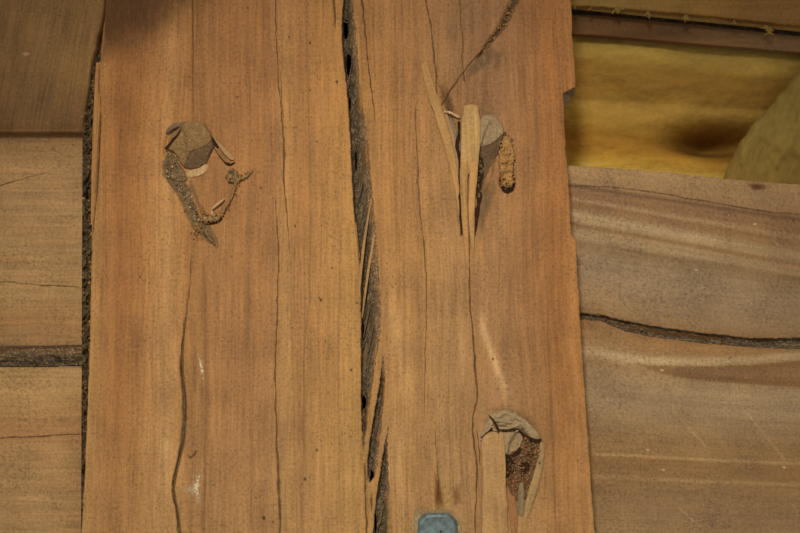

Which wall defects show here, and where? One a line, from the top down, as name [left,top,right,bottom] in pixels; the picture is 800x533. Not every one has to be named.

crack [172,262,196,533]
peeling [212,135,235,166]
crack [274,2,290,533]
crack [333,0,390,533]
crack [425,0,518,105]
crack [580,314,800,349]